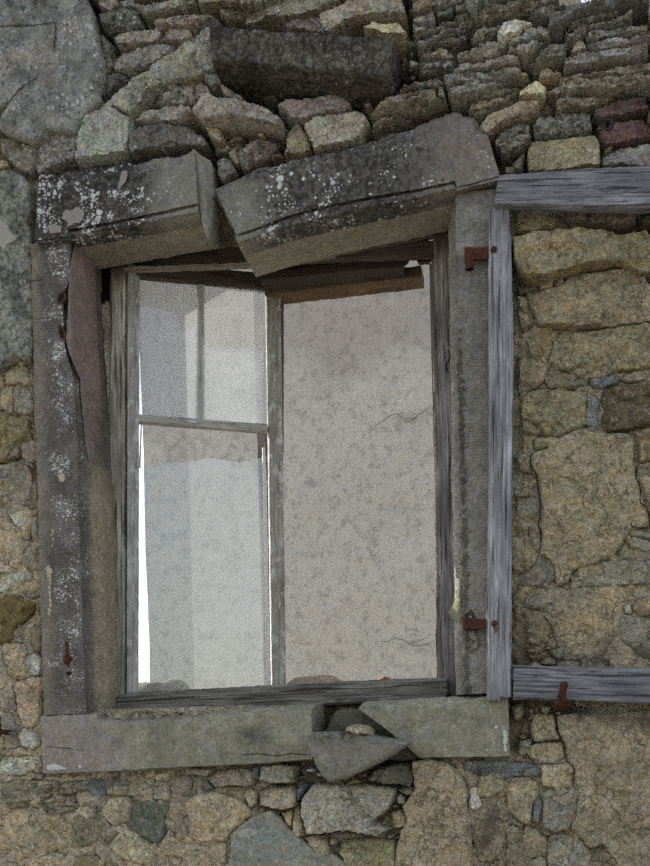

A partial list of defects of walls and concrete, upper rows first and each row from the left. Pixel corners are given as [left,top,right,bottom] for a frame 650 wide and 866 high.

crack [0,22,56,50]
crack [514,455,542,545]
crack [631,467,650,529]